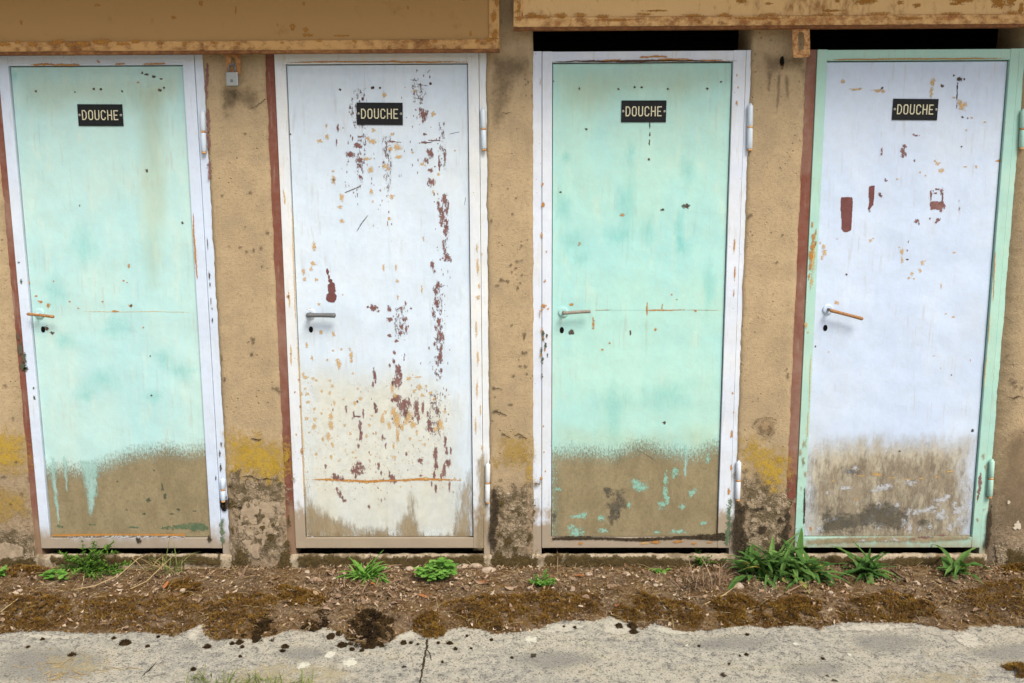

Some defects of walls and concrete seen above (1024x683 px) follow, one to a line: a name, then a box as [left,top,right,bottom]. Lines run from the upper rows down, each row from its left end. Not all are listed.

corrosion [0,0,500,67]
corrosion [513,0,1024,31]
corrosion [283,191,320,318]
corrosion [290,338,461,495]
water stain [50,457,67,520]
water stain [80,461,97,514]
water stain [488,489,533,551]
peeling [567,512,608,537]
peeling [658,467,697,510]
water stain [552,488,806,556]
water stain [823,503,902,533]